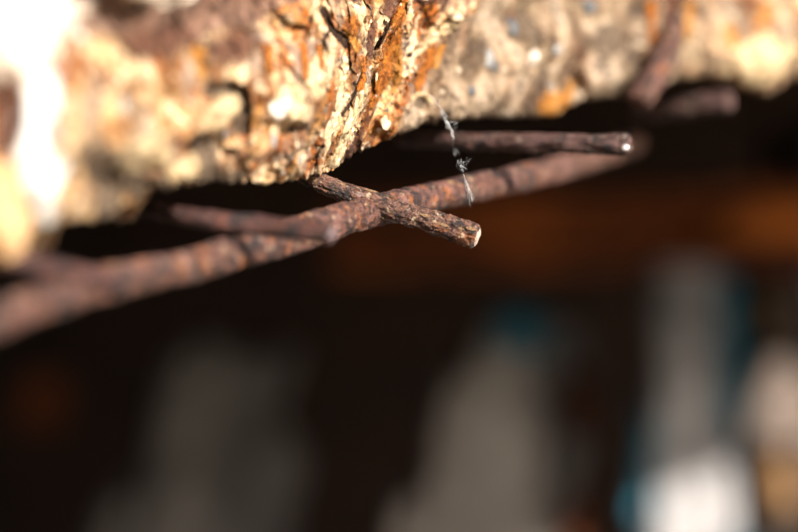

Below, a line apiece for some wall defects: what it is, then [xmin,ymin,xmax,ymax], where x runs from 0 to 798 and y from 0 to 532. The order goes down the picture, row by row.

corrosion [113,22,275,82]
peeling [202,93,241,129]
spalling [269,49,337,126]
corrosion [300,42,325,82]
crack [318,5,352,51]
crack [341,70,363,117]
spalling [327,73,391,171]
crack [374,2,399,50]
corrosion [343,0,449,143]
spalling [412,12,465,58]
corrosion [0,79,43,261]
corrosion [338,182,476,231]